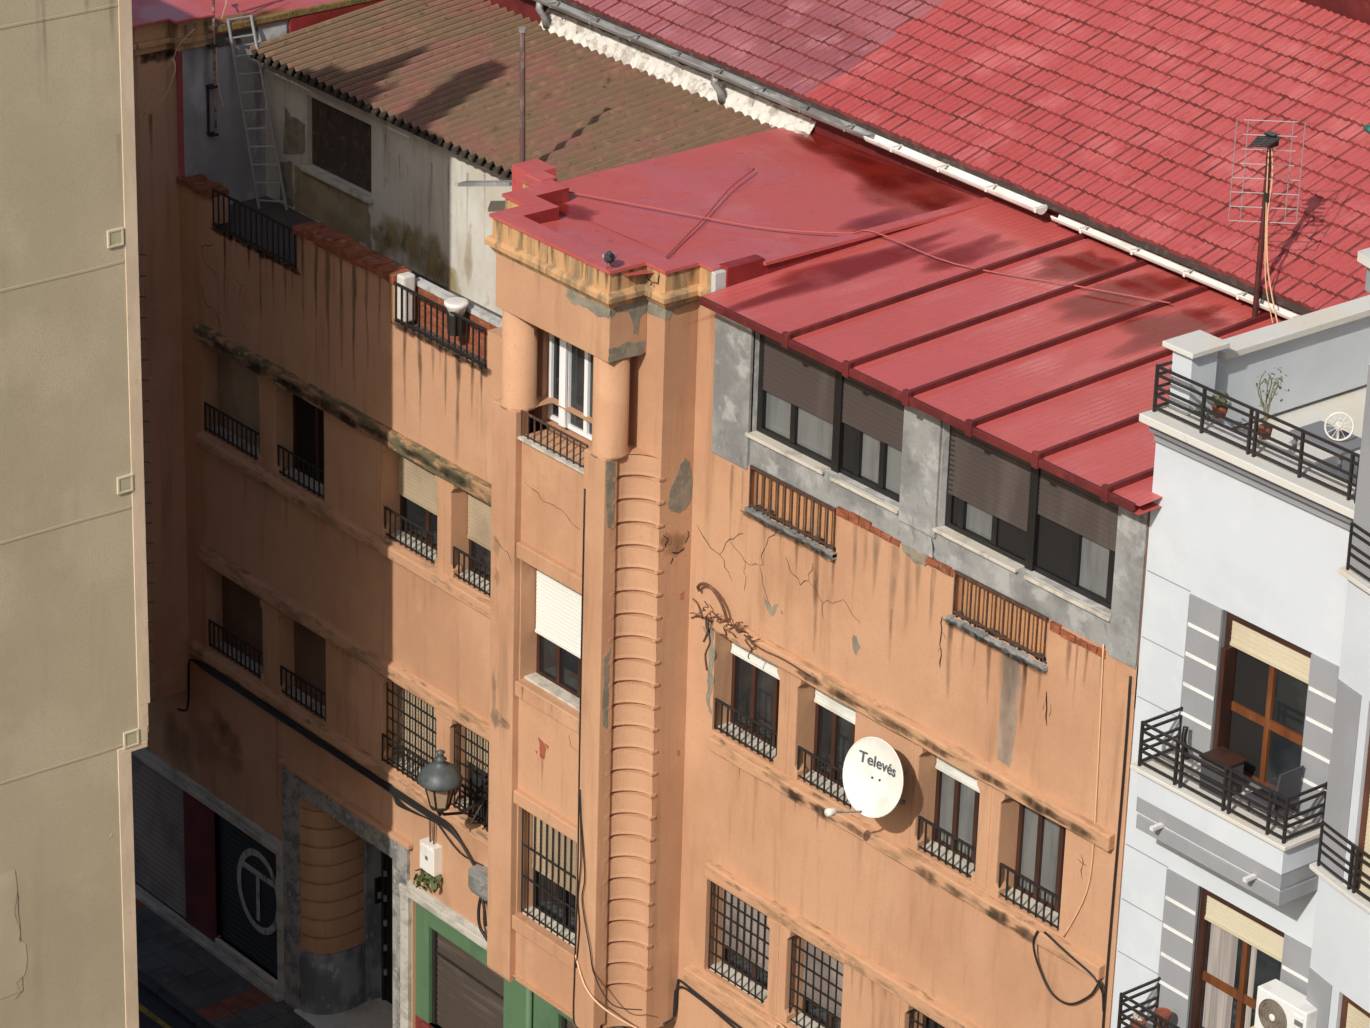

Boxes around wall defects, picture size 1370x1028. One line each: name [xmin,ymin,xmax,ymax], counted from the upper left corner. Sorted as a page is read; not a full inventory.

leakage [212,225,299,274]
leakage [394,322,489,378]
leakage [277,376,385,439]
peeling [668,458,693,513]
crack [698,528,855,619]
leakage [944,619,1041,673]
leakage [1027,798,1055,819]